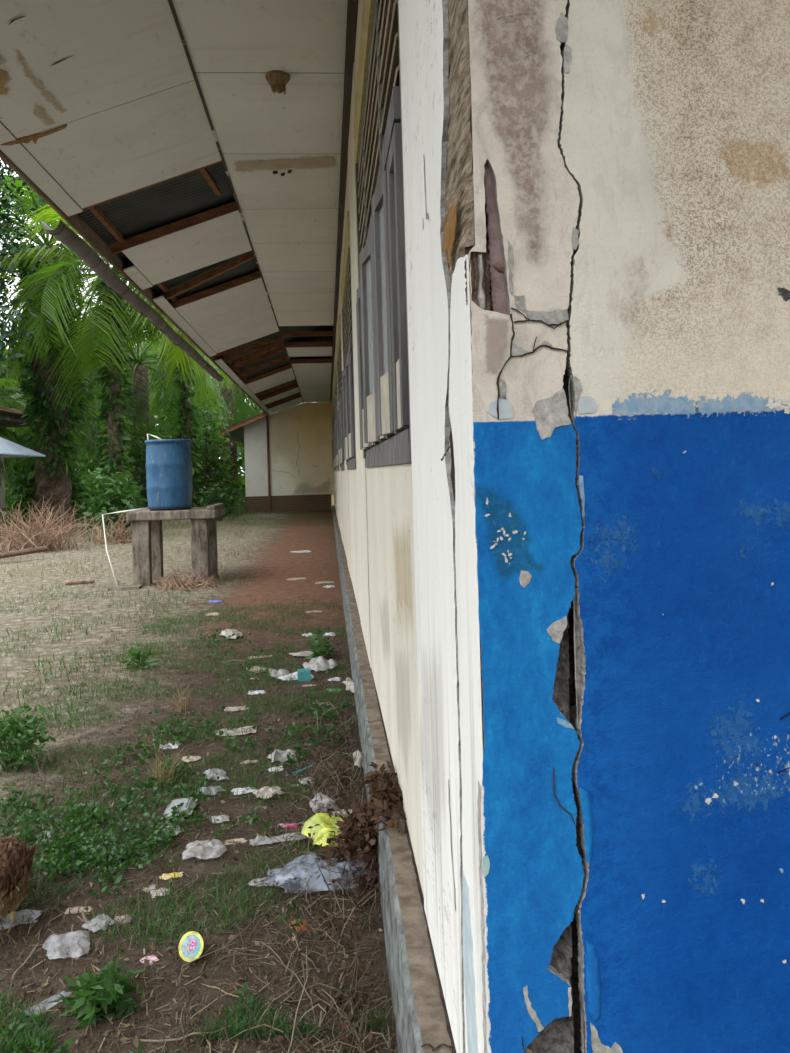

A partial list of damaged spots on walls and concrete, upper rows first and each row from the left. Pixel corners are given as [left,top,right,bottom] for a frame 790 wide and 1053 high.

damp [0,56,9,95]
damp [17,51,65,125]
damp [482,0,544,213]
flaking render [442,0,569,324]
damp [777,287,790,301]
crack [496,308,573,420]
flaking render [531,376,596,440]
peeling [612,389,790,420]
peeling [547,616,567,644]
crack [552,588,583,739]
crack [553,767,584,870]
crack [522,910,585,1053]